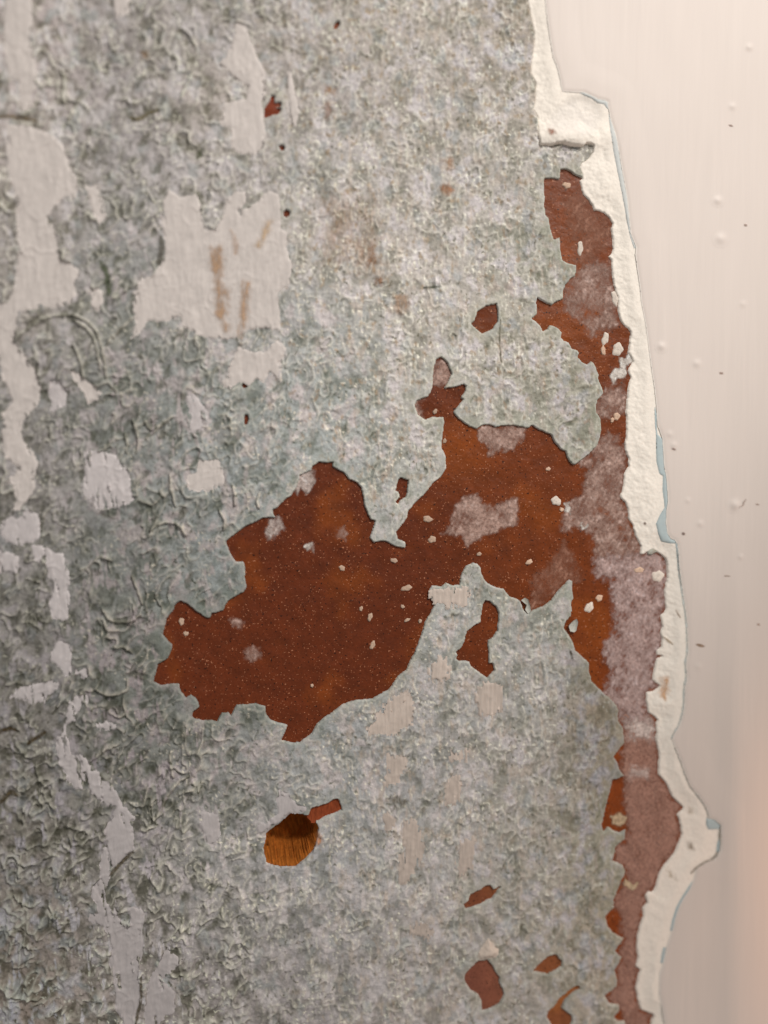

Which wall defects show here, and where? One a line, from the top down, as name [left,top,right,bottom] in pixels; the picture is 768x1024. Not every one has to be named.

rust [211,247,227,331]
peeling [154,0,721,1024]